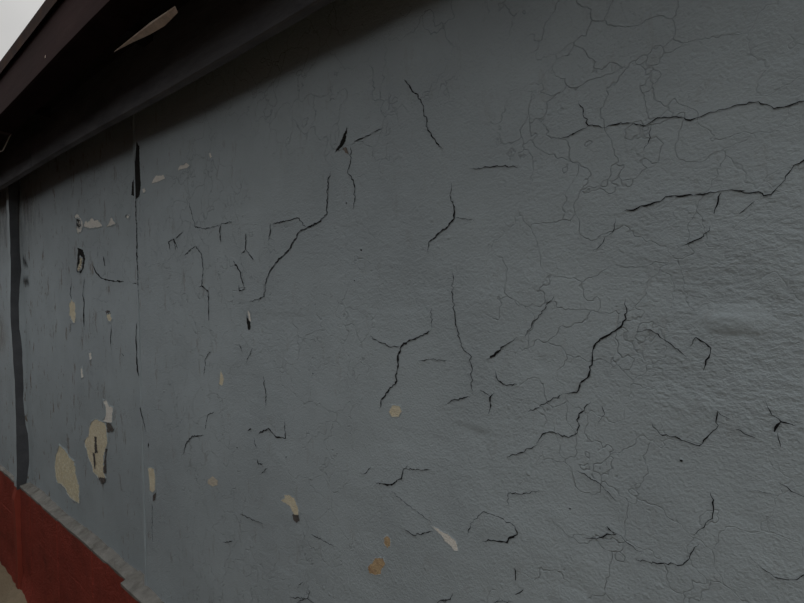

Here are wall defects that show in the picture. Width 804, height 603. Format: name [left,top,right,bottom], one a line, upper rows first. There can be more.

crack [556,101,804,145]
crack [233,129,380,300]
crack [427,185,472,251]
crack [594,160,804,250]
crack [374,309,433,407]
crack [447,276,554,411]
crack [509,303,711,457]
peeling [54,444,81,504]
peeling [84,398,114,484]
peeling [280,494,300,523]
crack [468,491,535,543]
crack [583,492,714,566]